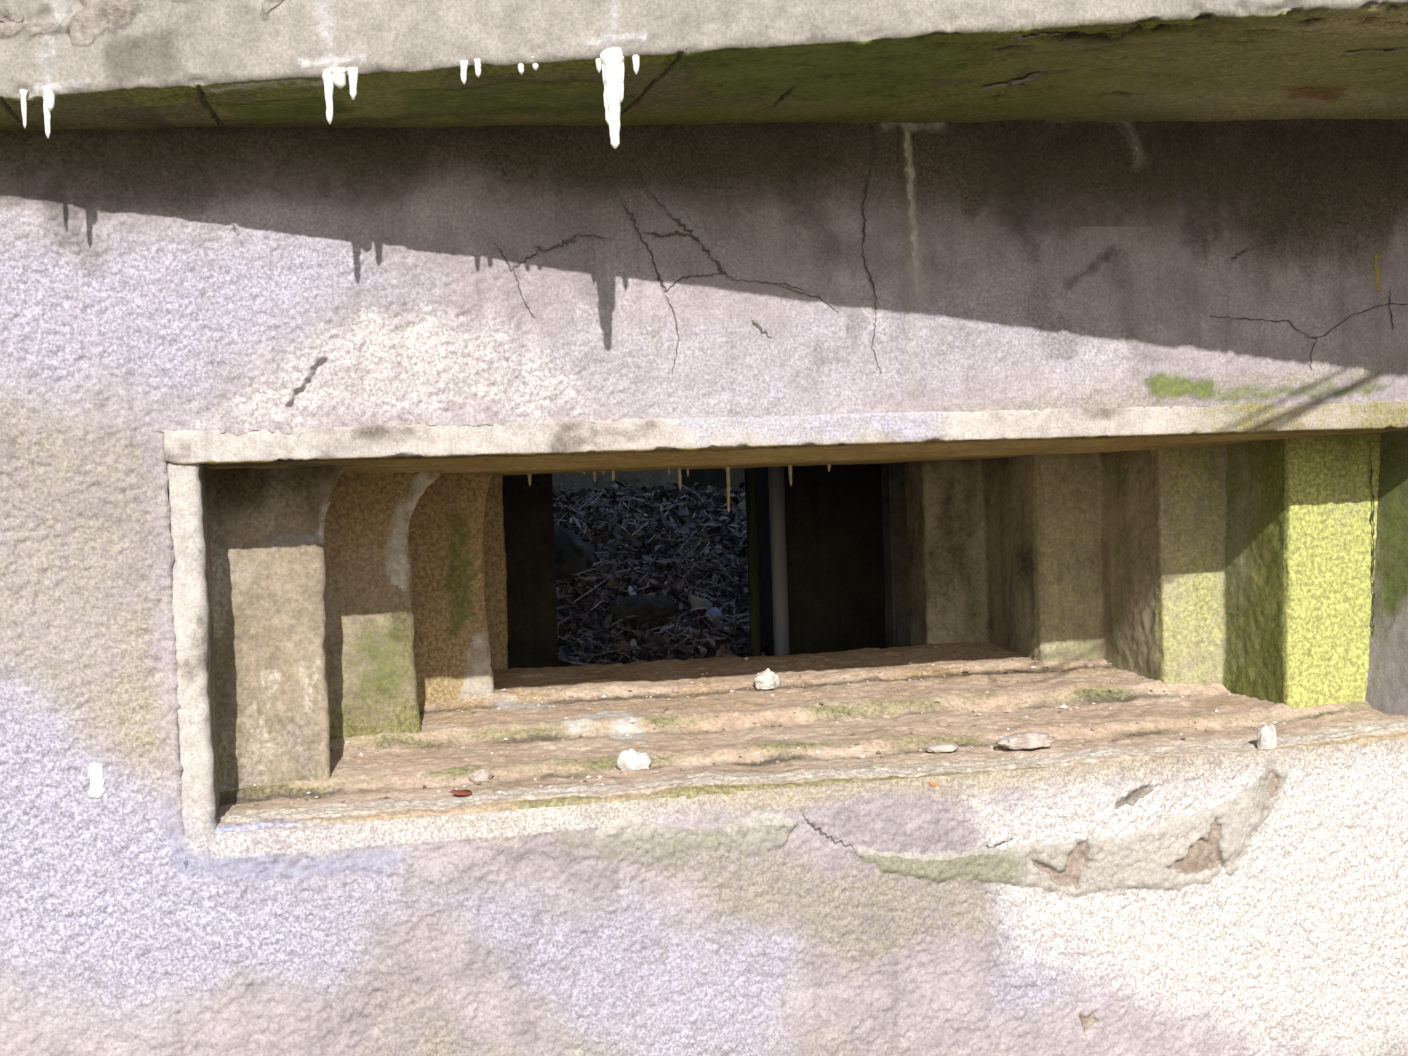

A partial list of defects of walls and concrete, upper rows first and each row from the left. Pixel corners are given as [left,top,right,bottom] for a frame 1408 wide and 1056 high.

crack [194,84,221,127]
crack [494,174,838,374]
crack [861,123,881,372]
damp [882,122,943,292]
crack [1212,291,1408,371]
flaking render [857,756,1287,894]